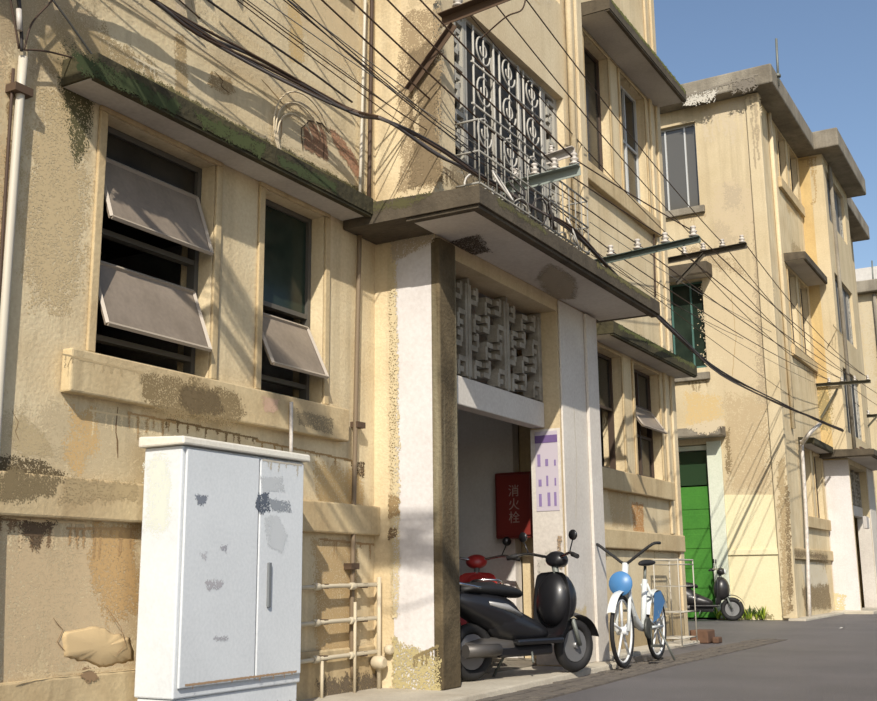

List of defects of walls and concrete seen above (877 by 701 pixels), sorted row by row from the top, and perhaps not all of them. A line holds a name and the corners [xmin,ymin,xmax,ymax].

damp [0,0,193,320]
damp [207,71,236,95]
flaking render [264,109,365,188]
damp [412,84,420,144]
damp [683,74,760,167]
damp [0,354,258,507]
damp [678,174,847,620]
damp [0,516,142,683]